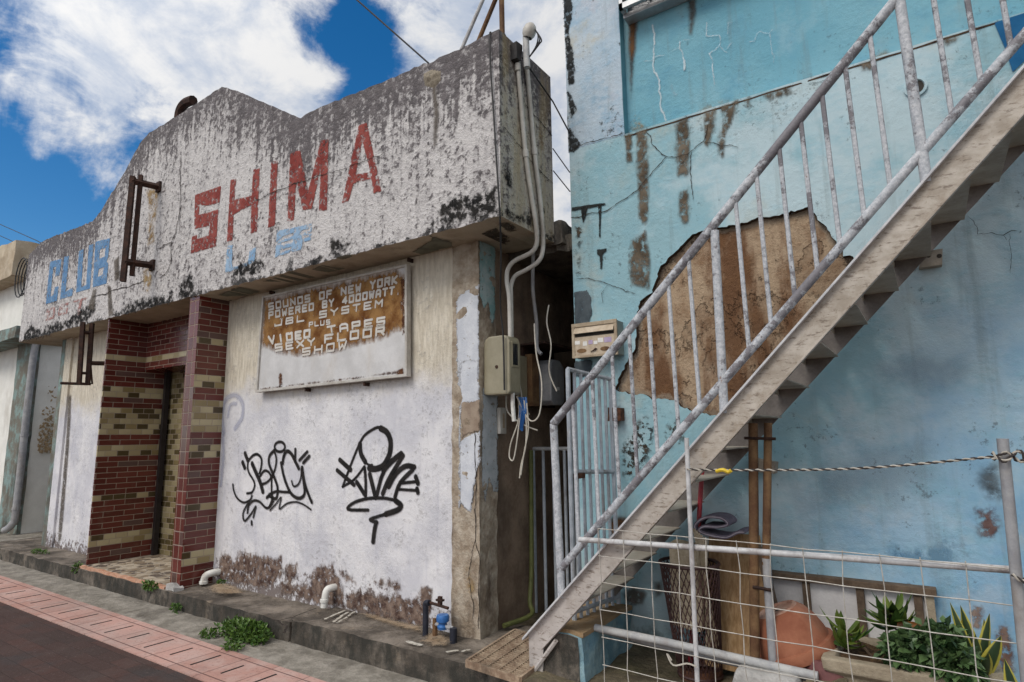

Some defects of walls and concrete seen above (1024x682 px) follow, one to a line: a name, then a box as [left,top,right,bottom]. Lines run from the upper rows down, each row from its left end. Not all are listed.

crack [571,24,751,218]
water stain [428,166,545,229]
water stain [232,254,265,279]
water stain [313,236,350,265]
water stain [23,258,194,342]
spalling [619,209,854,415]
peeling [456,223,516,512]
water stain [622,421,684,475]
water stain [213,584,241,593]